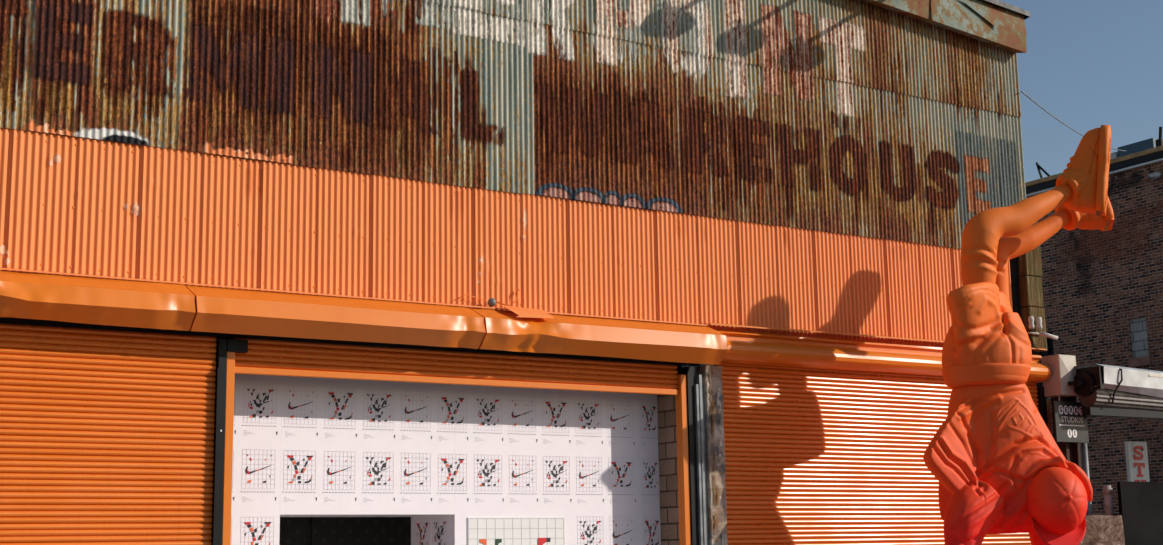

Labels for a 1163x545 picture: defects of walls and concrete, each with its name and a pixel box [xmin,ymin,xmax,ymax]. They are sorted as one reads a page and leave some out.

corrosion [0,0,487,174]
corrosion [535,24,959,241]
corrosion [954,47,1001,127]